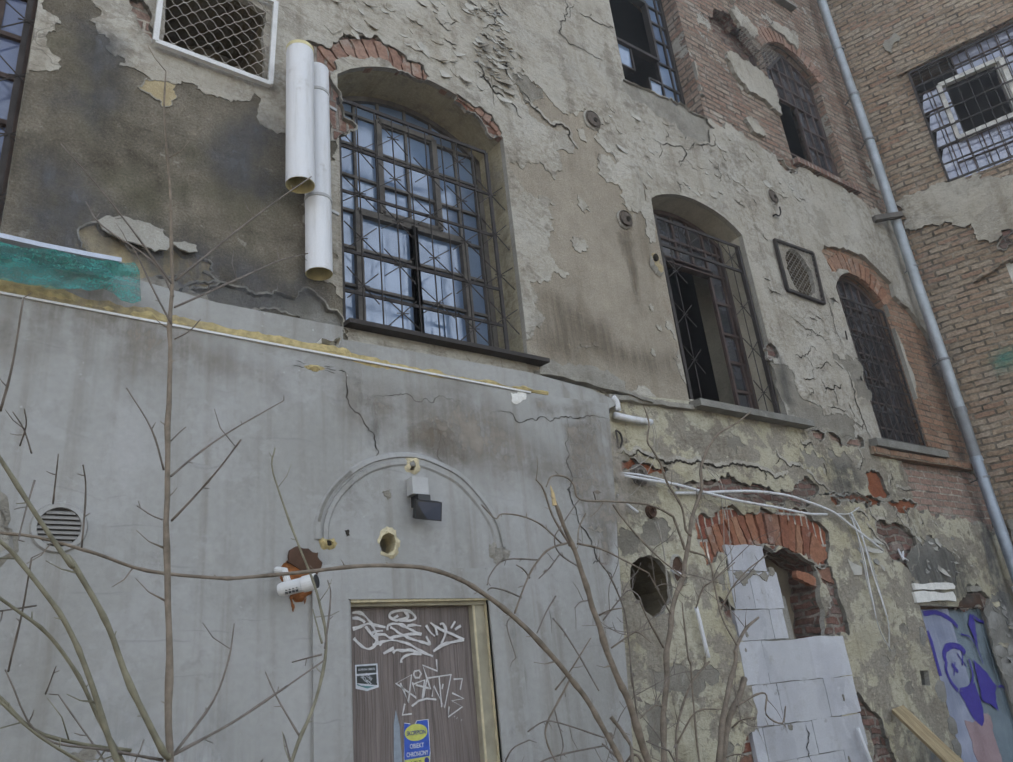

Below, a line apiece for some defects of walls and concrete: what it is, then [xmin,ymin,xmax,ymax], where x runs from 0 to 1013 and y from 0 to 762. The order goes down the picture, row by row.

spalling [129,0,154,38]
peeling [138,78,177,107]
spalling [621,79,801,201]
crack [763,276,870,469]
crack [339,370,379,456]
spalling [613,456,669,476]
crack [614,438,832,493]
peeling [0,490,19,567]
crack [490,411,623,612]
peeling [618,517,671,557]
spalling [673,342,1013,707]
crack [854,470,938,550]